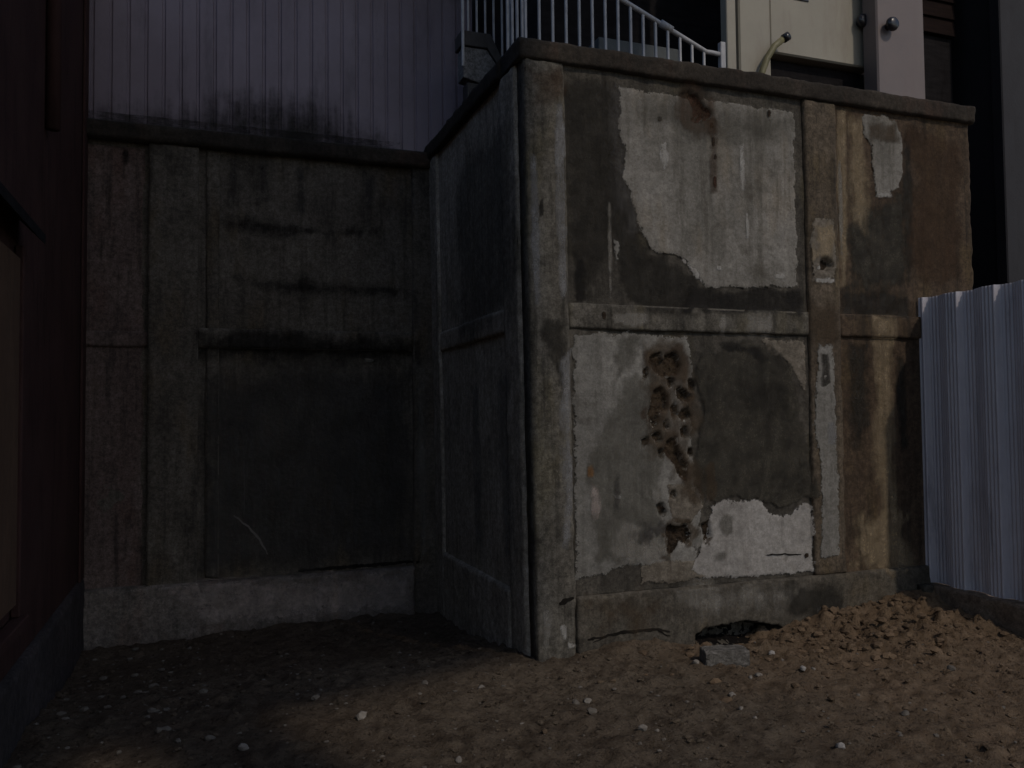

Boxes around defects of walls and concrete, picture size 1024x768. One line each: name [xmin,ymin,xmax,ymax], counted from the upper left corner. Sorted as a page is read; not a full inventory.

damp [555,80,821,508]
flaking render [617,87,837,289]
damp [813,138,913,341]
flaking render [861,114,903,197]
flaking render [571,330,840,585]
crack [588,628,670,643]